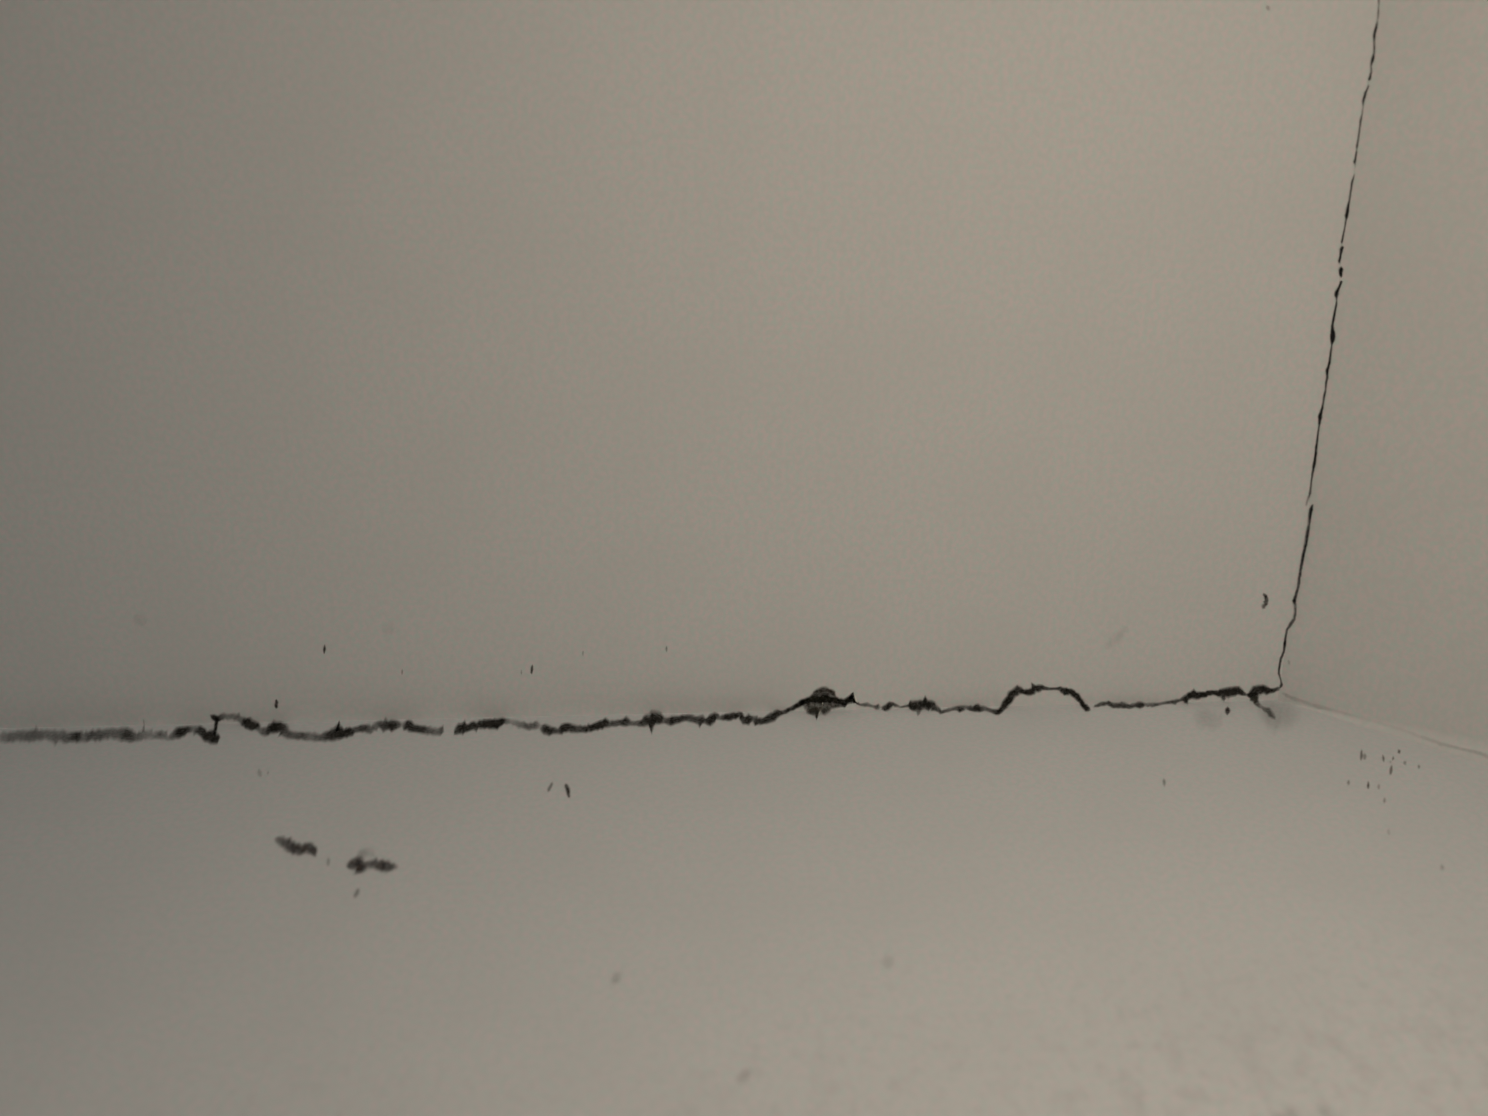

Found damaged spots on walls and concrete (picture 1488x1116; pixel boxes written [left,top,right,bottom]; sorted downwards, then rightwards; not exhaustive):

crack [856,0,1379,717]
crack [25,700,805,743]